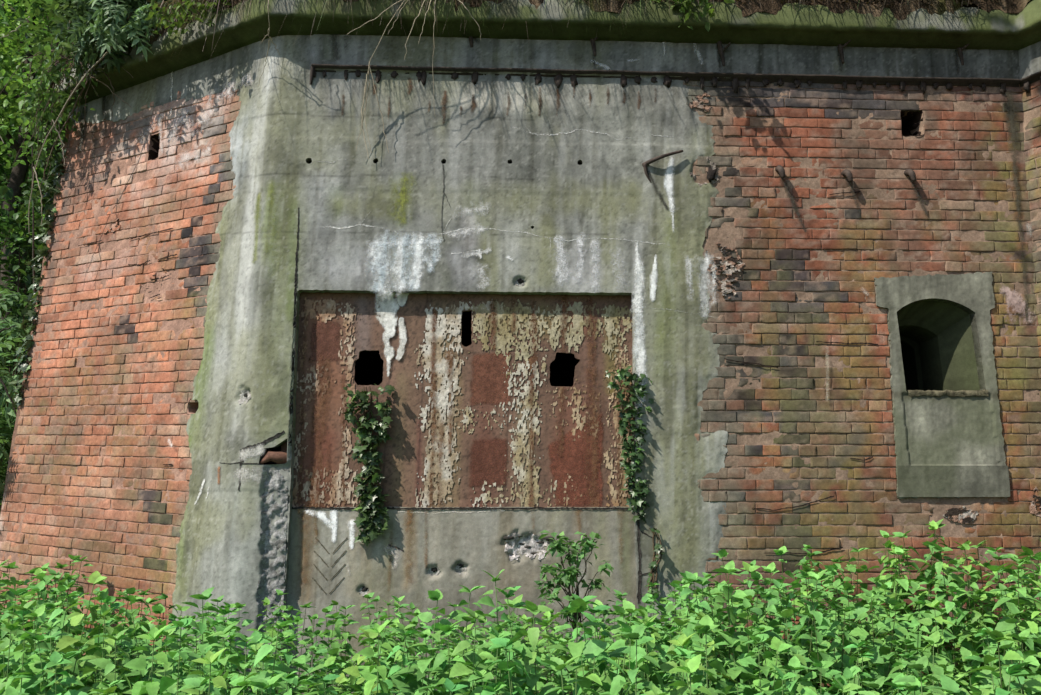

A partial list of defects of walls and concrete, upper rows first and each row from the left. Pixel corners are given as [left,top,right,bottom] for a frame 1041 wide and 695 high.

peeling [256,297,362,661]
corrosion [298,310,345,565]
efflorescence [370,227,483,376]
corrosion [429,309,453,504]
corrosion [470,438,508,486]
corrosion [470,300,511,405]
spalling [503,532,554,561]
corrosion [549,298,603,515]
efflorescence [632,243,657,405]
efflorescence [686,257,716,316]
spalling [707,242,745,299]
spalling [943,506,979,524]